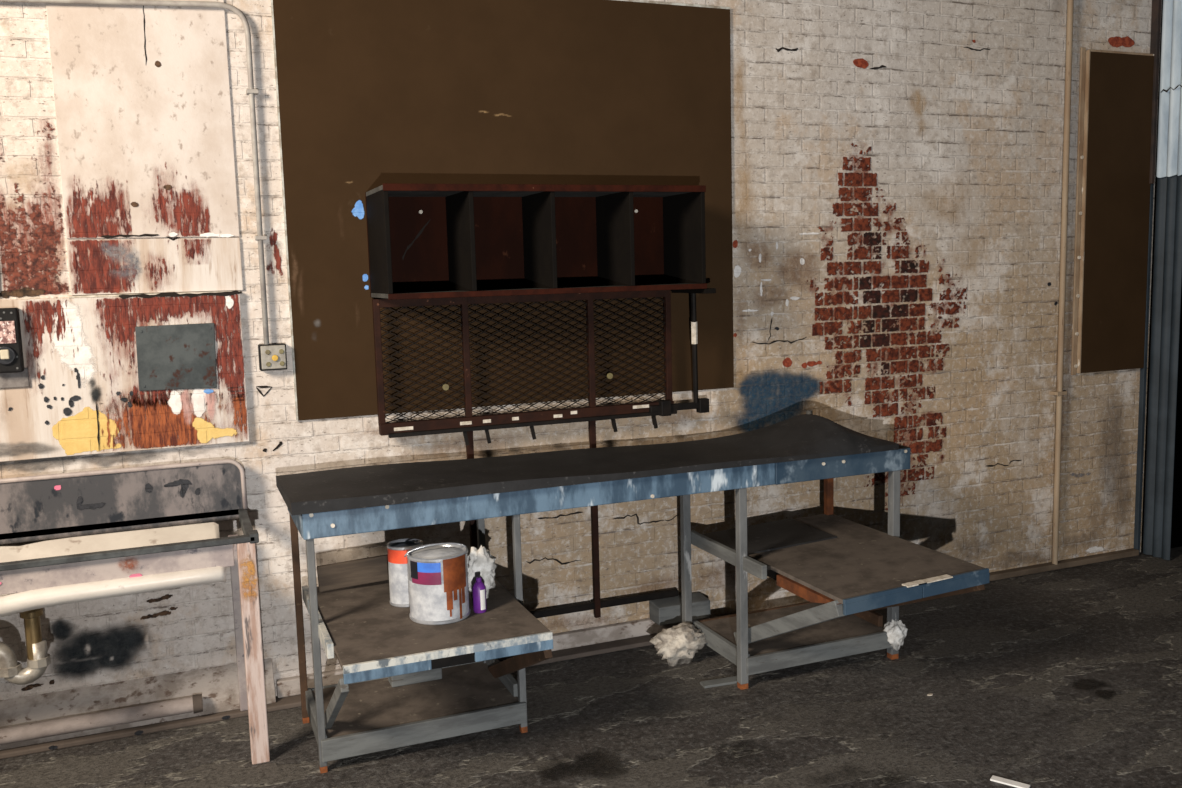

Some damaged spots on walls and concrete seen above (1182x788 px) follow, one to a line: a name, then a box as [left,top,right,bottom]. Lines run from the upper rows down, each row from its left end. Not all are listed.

spalling [0,287,45,298]
peeling [783,143,967,510]